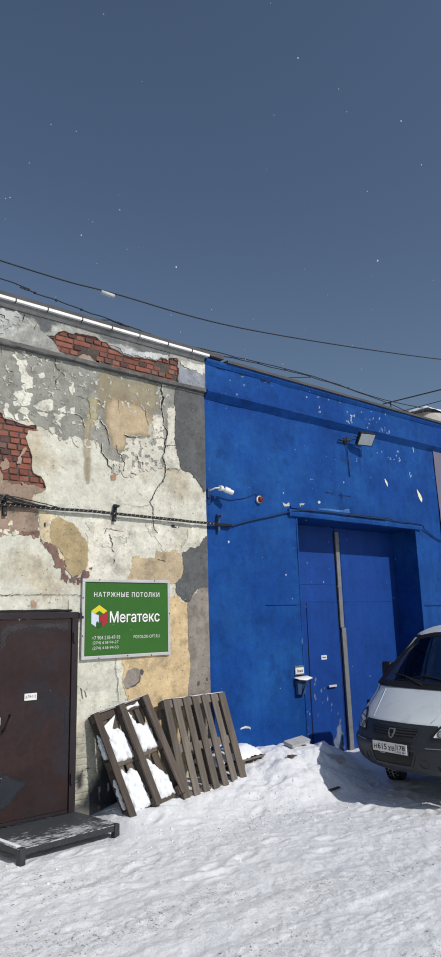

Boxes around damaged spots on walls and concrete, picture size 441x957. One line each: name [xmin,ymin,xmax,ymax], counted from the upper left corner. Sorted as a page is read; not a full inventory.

peeling [0,308,208,768]
crack [55,359,175,533]